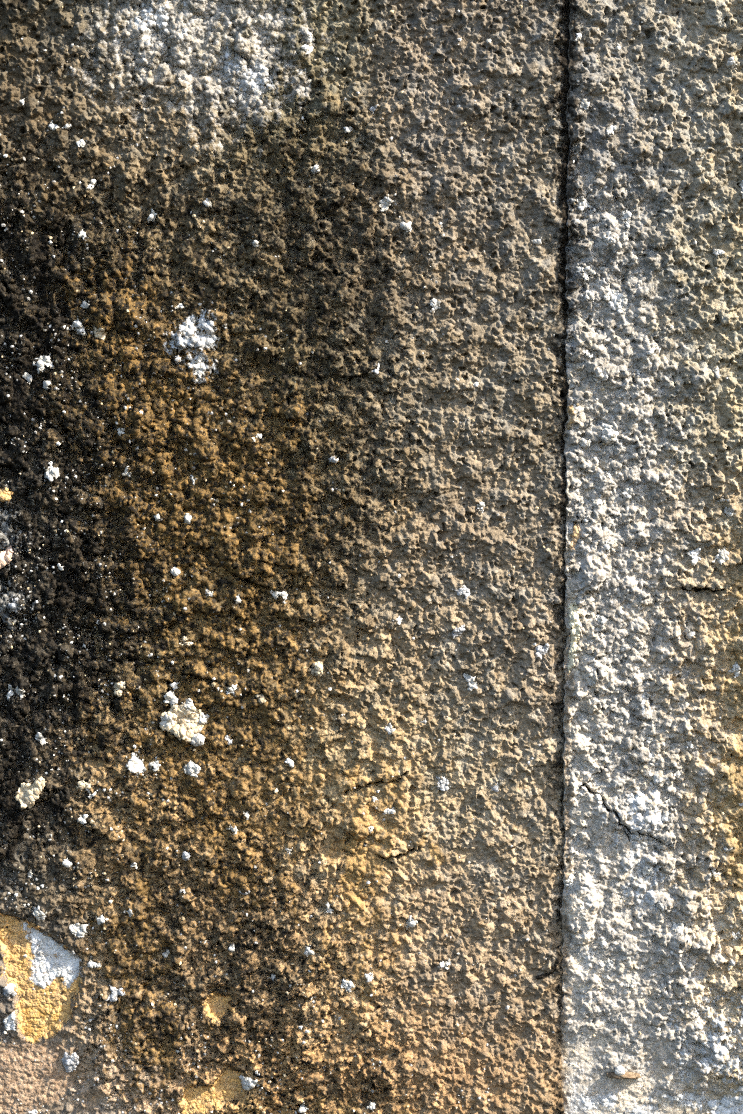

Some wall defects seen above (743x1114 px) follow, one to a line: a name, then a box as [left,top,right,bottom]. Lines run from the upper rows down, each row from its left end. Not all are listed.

leakage [0,0,454,1114]
crack [536,0,675,1114]
peeling [106,985,125,1002]
peeling [177,1067,264,1114]
peeling [663,1092,743,1114]